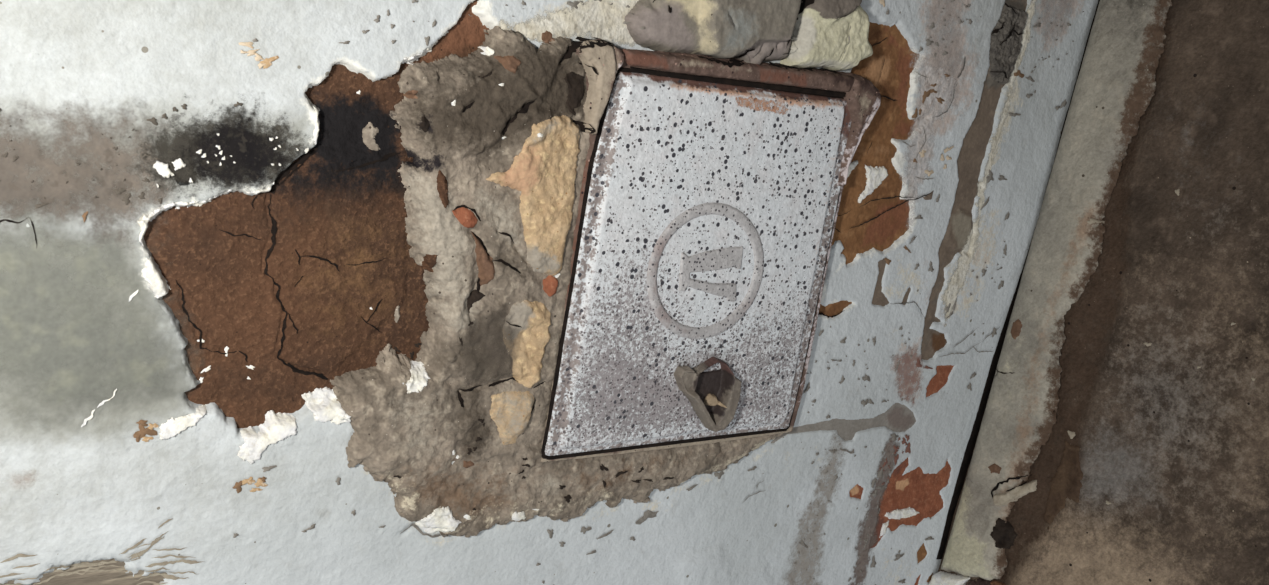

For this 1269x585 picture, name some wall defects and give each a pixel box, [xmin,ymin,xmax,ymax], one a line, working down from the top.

flaking render [832,0,1074,397]
crack [219,148,400,380]
flaking render [113,0,649,493]
crack [176,281,247,362]
flaking render [819,300,852,336]
peeling [803,337,889,413]
flaking render [0,518,203,585]
flaking render [415,506,461,533]
flaking render [511,511,526,521]
peeling [630,510,659,541]
peeling [794,446,867,580]
flaking render [848,433,951,585]